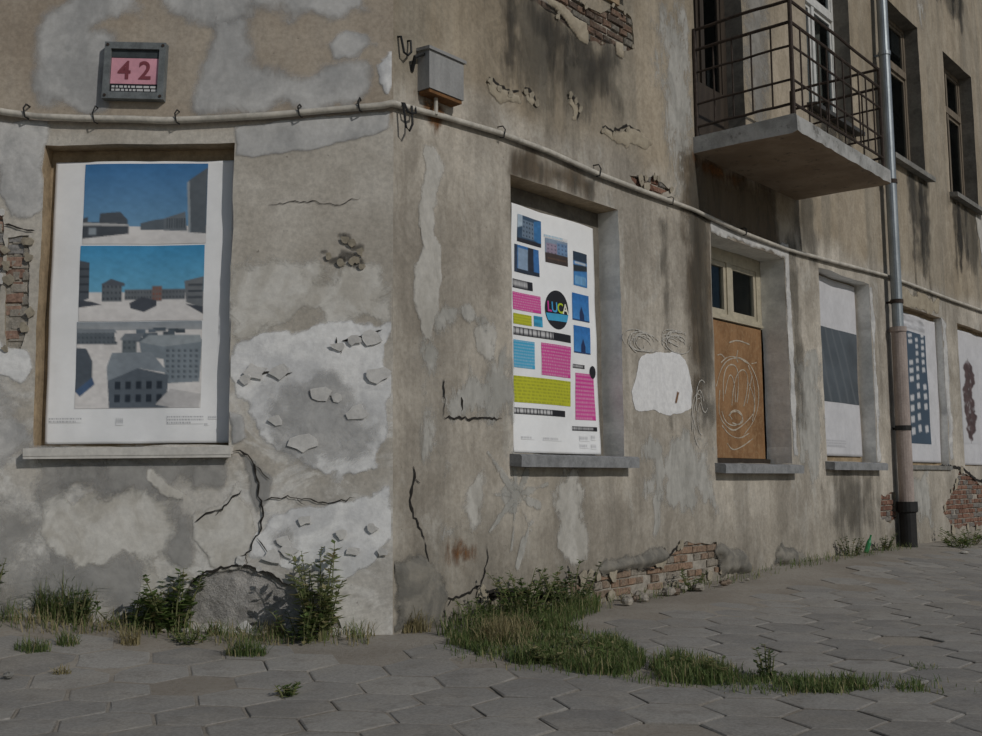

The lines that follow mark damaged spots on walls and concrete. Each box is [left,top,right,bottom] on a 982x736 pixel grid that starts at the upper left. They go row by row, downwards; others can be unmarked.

water stain [507,0,610,112]
spalling [533,0,635,58]
water stain [909,174,929,276]
spalling [0,208,35,383]
peeling [229,234,392,480]
crack [443,381,502,421]
spalling [902,286,982,535]
crack [190,450,353,595]
crack [409,466,429,562]
crack [448,541,688,604]
spalling [552,468,722,601]
crack [940,464,982,482]